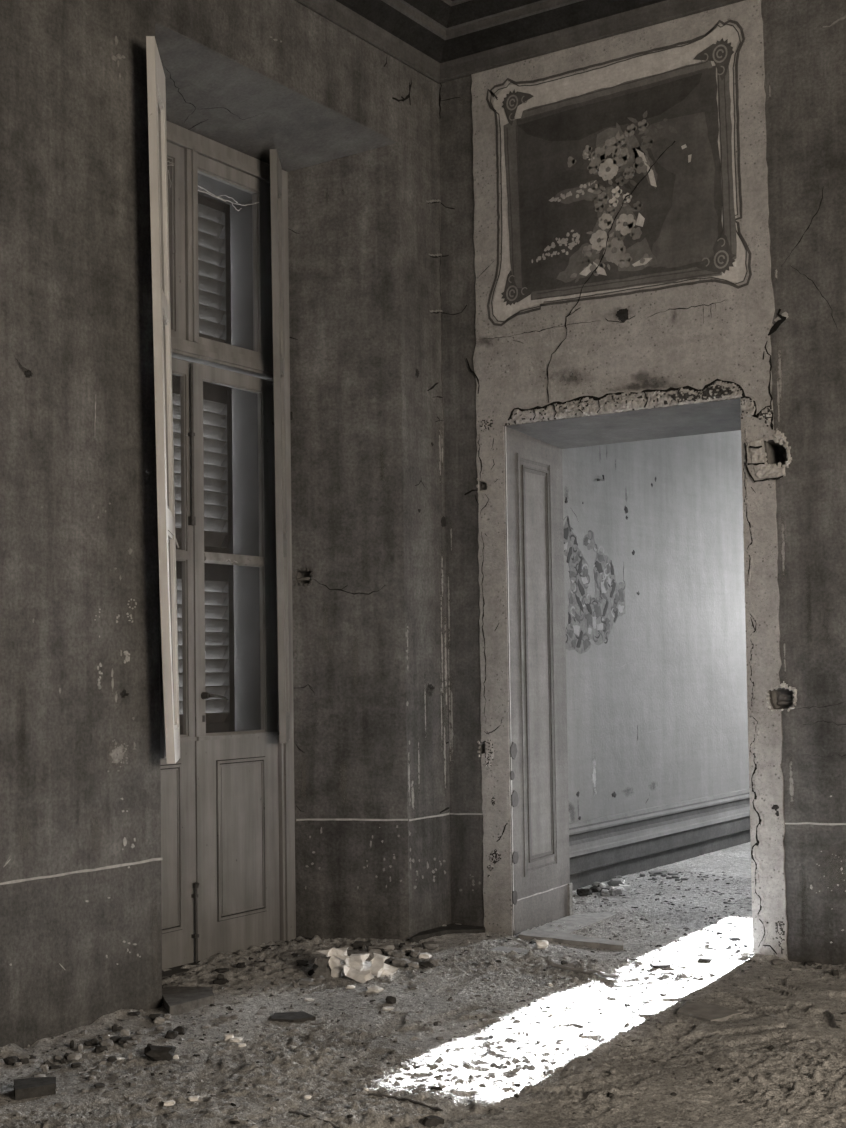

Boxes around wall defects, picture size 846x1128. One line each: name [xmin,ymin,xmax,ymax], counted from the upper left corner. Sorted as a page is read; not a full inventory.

crack [426,199,467,344]
crack [466,358,480,394]
crack [485,141,676,403]
crack [649,300,725,324]
crack [762,309,789,407]
flaking render [479,379,792,479]
crack [743,427,783,954]